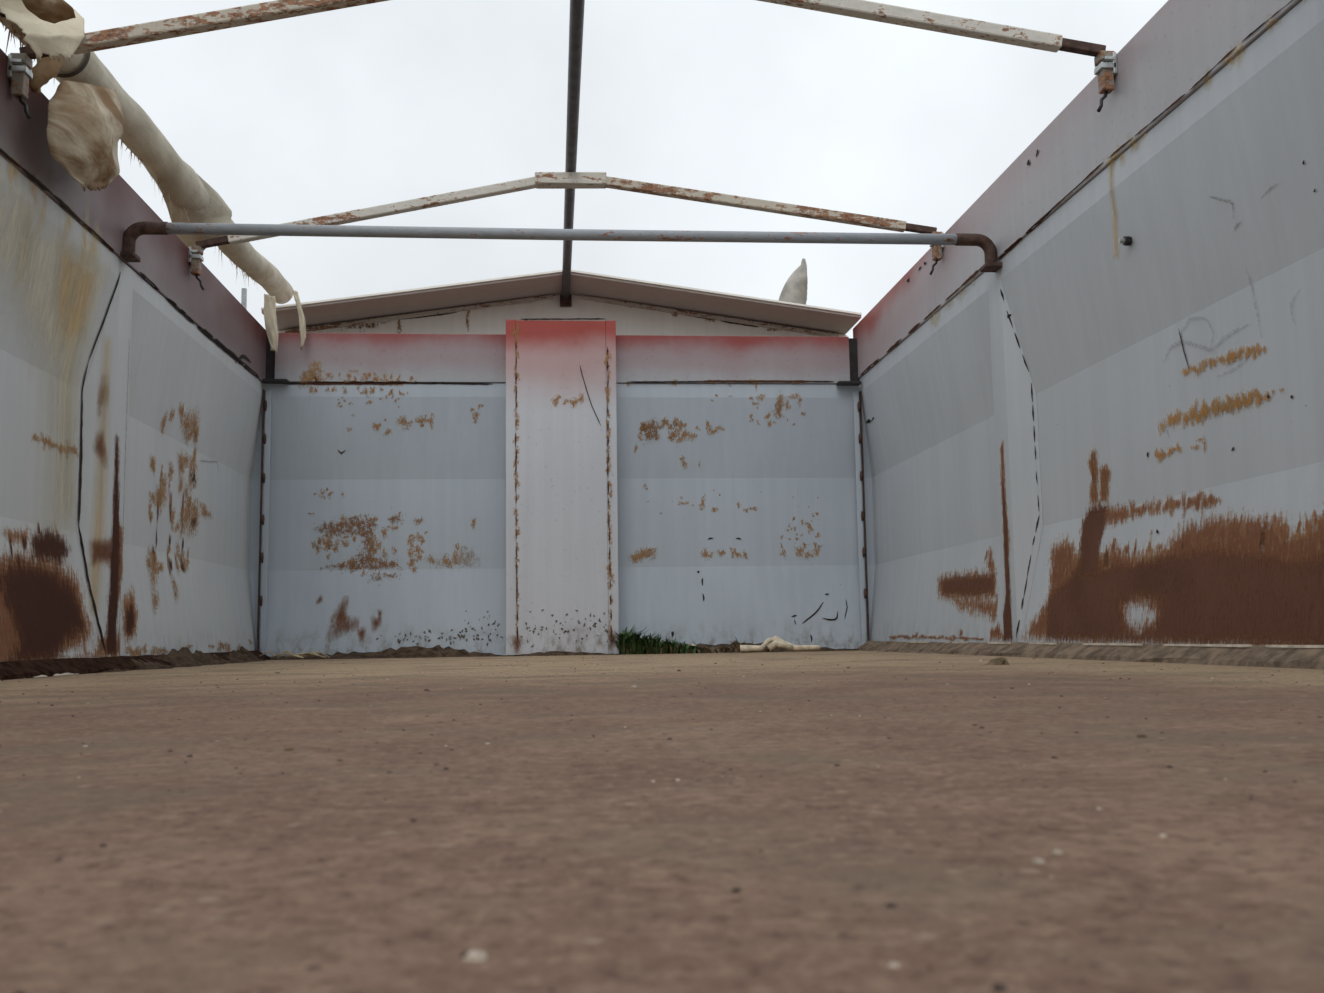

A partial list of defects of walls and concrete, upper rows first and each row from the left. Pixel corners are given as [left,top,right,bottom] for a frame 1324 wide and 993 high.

corrosion [1183,342,1266,375]
corrosion [635,417,725,469]
corrosion [749,379,806,428]
corrosion [1154,388,1284,462]
corrosion [0,402,211,661]
corrosion [308,512,459,586]
corrosion [631,548,655,563]
corrosion [700,547,747,560]
corrosion [780,497,822,559]
corrosion [889,441,1324,645]
corrosion [334,602,381,640]